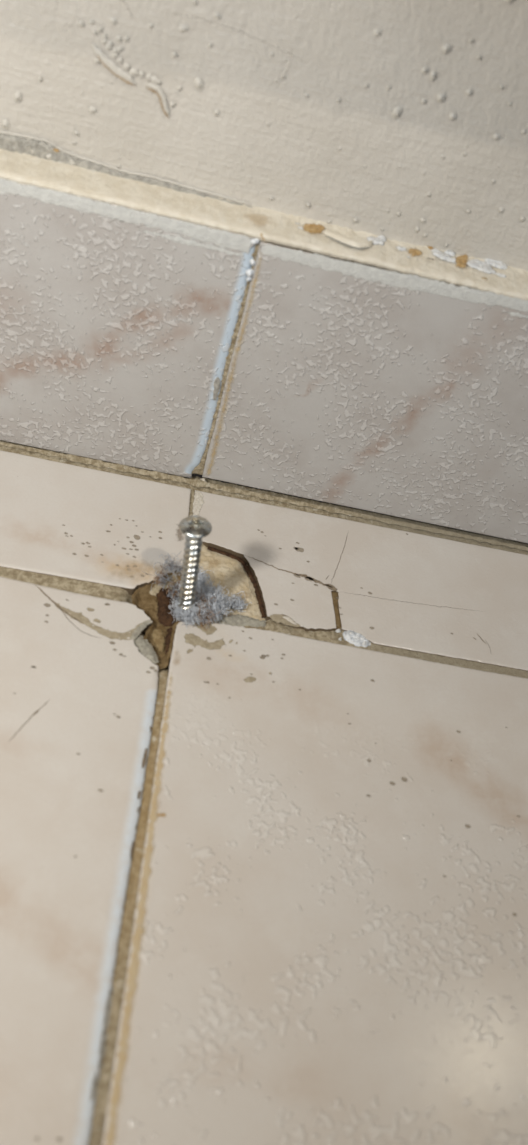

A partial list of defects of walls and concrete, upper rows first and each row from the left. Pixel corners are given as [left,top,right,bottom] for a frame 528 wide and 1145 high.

crack [35,584,99,638]
spalling [106,518,182,673]
spalling [199,546,300,656]